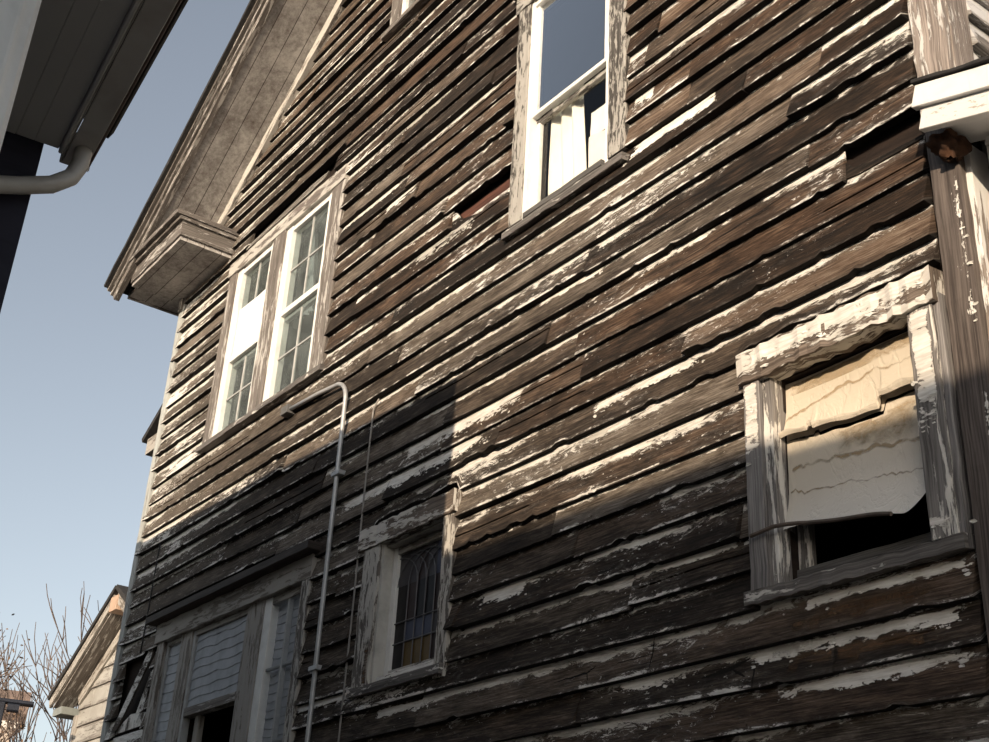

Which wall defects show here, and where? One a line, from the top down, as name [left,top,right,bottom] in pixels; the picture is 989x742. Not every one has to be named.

peeling [632,87,654,112]
peeling [621,92,716,168]
peeling [747,269,937,432]
peeling [337,386,527,515]
peeling [417,377,497,423]
peeling [568,429,608,452]
peeling [567,440,662,481]
peeling [590,359,705,418]
peeling [744,383,760,467]
peeling [805,560,973,611]
peeling [751,602,972,669]
peeling [778,649,982,700]